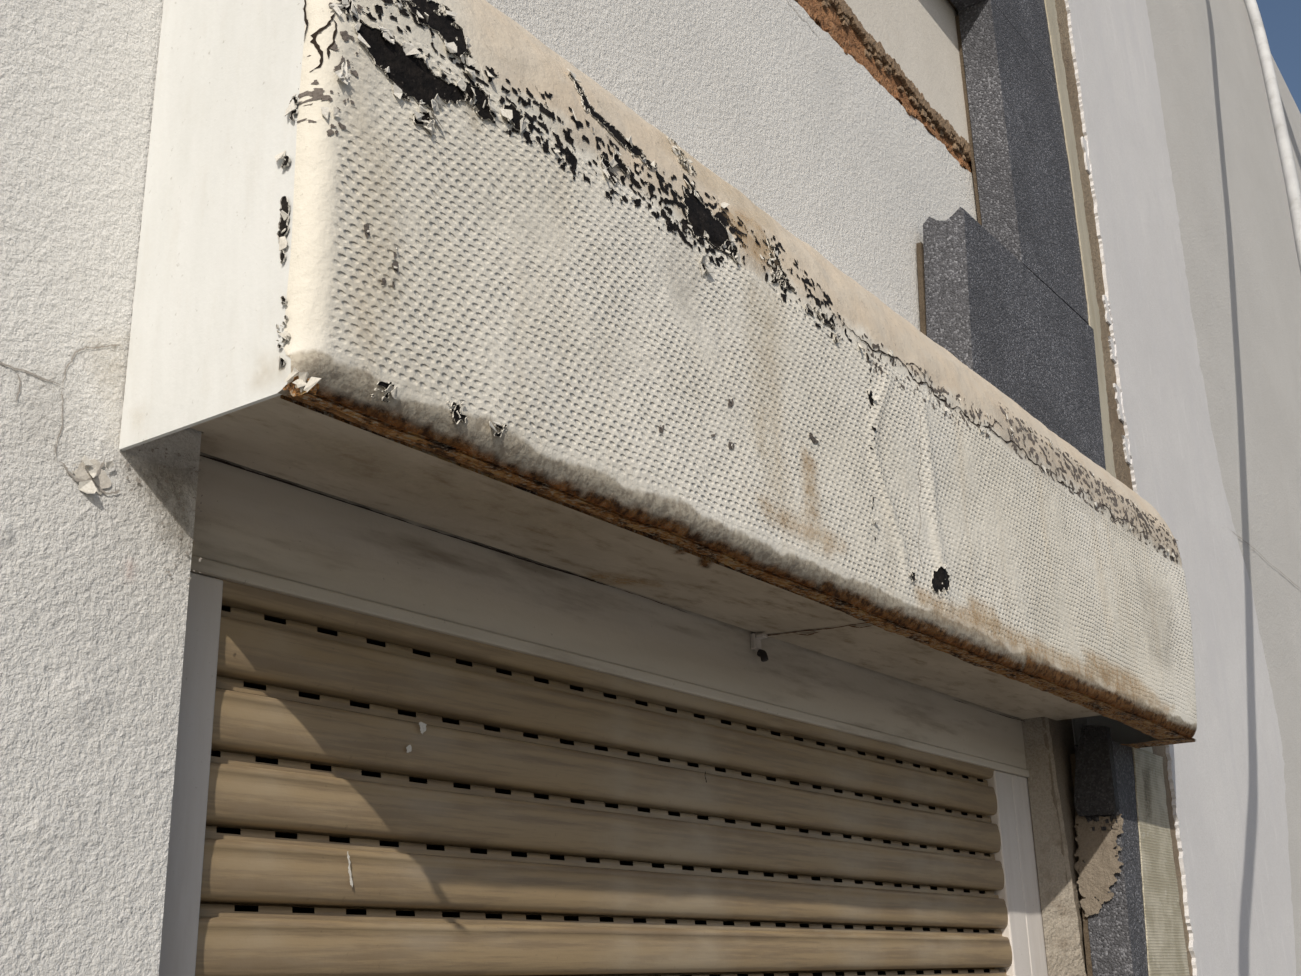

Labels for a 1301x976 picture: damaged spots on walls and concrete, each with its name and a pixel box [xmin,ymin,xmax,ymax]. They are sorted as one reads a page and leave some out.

peeling [275,150,291,169]
peeling [277,196,290,264]
peeling [285,0,1180,564]
spalling [276,296,322,397]
crack [0,344,120,460]
spalling [59,455,121,495]
peeling [909,564,951,596]